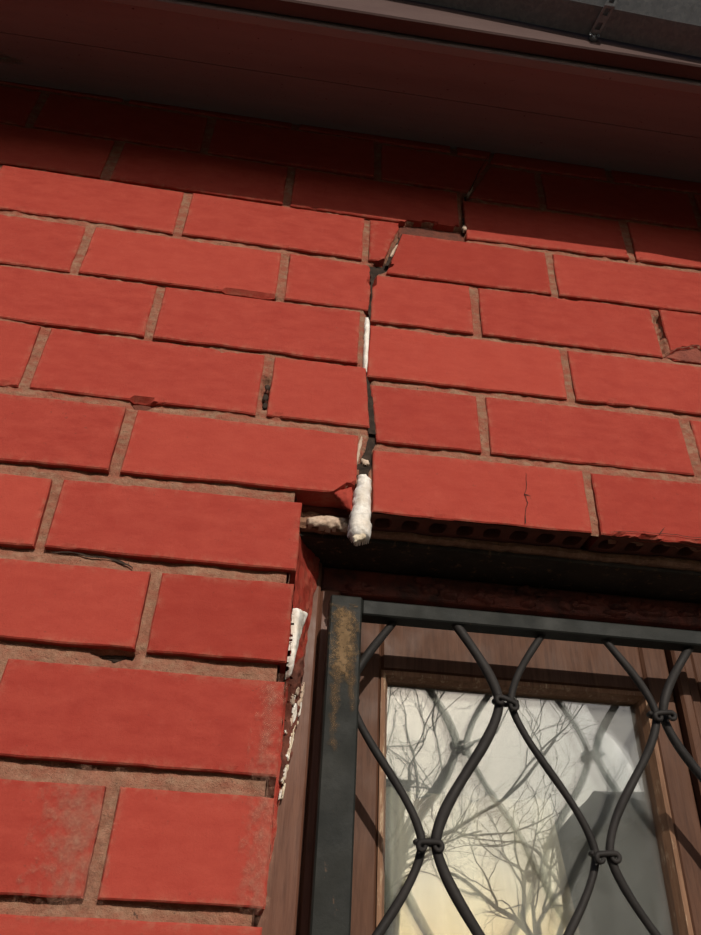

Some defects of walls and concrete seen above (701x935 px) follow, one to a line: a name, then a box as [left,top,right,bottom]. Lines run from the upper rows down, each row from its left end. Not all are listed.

crack [461,156,488,233]
crack [368,234,402,319]
crack [355,375,376,485]
spalling [278,654,305,800]